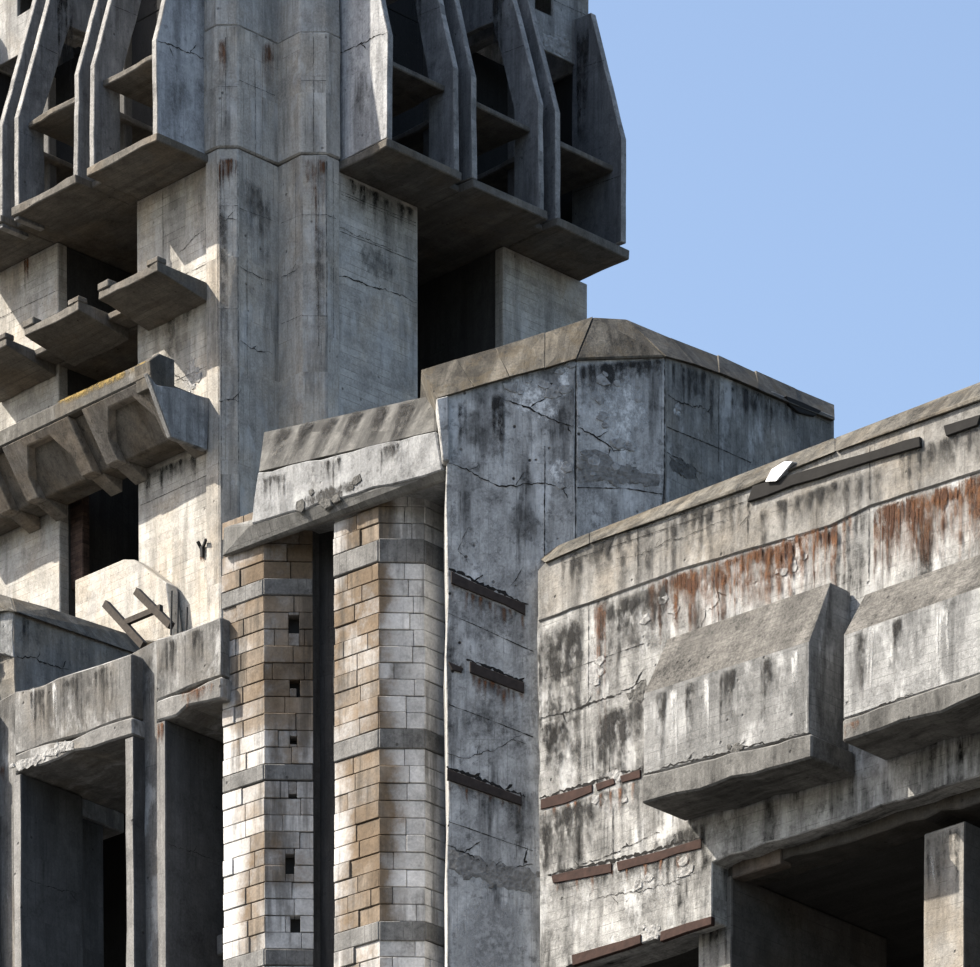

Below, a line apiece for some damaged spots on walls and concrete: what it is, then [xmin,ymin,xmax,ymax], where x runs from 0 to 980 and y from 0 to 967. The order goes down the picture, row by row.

crack [339,276,417,303]
crack [504,398,625,456]
spalling [295,474,362,514]
crack [449,463,568,498]
rust [874,477,980,563]
rust [650,519,851,626]
damp [599,584,666,658]
damp [538,623,582,758]
spalling [9,740,73,771]
damp [597,701,642,786]
damp [540,795,603,867]
spalling [448,849,540,967]